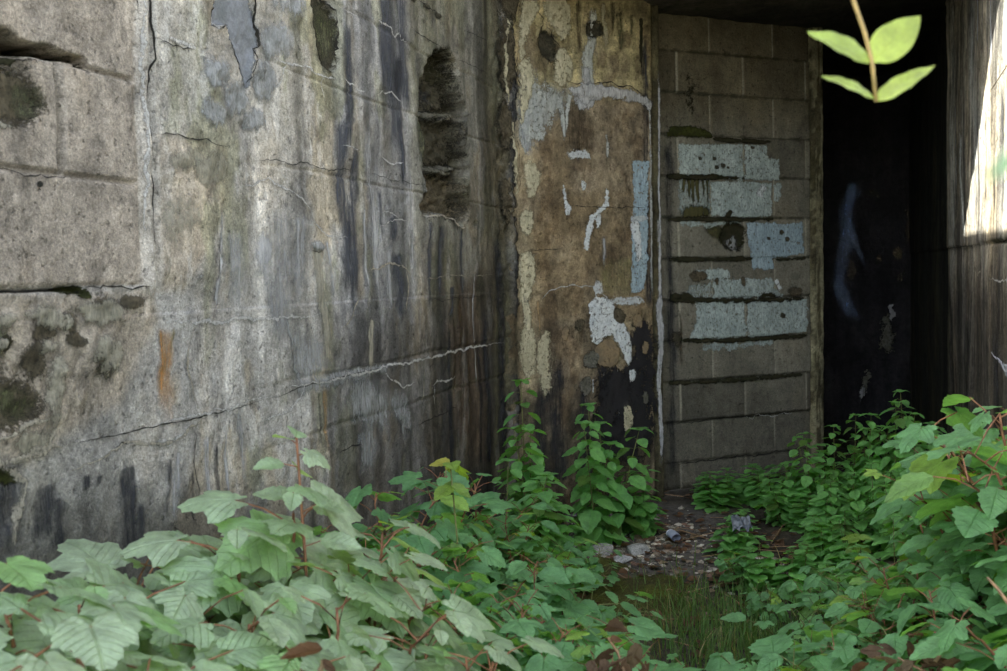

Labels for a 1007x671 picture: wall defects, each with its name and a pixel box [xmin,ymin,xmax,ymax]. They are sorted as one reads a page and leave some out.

rust [159,330,174,395]
crack [137,0,222,298]
spalling [201,0,339,131]
crack [66,328,499,491]
water stain [335,0,414,314]
water stain [351,320,415,466]
water stain [428,45,522,462]
peeling [518,251,649,396]
peeling [518,0,652,236]
peeling [584,188,610,250]
water stain [534,42,682,481]
peeling [678,143,809,352]